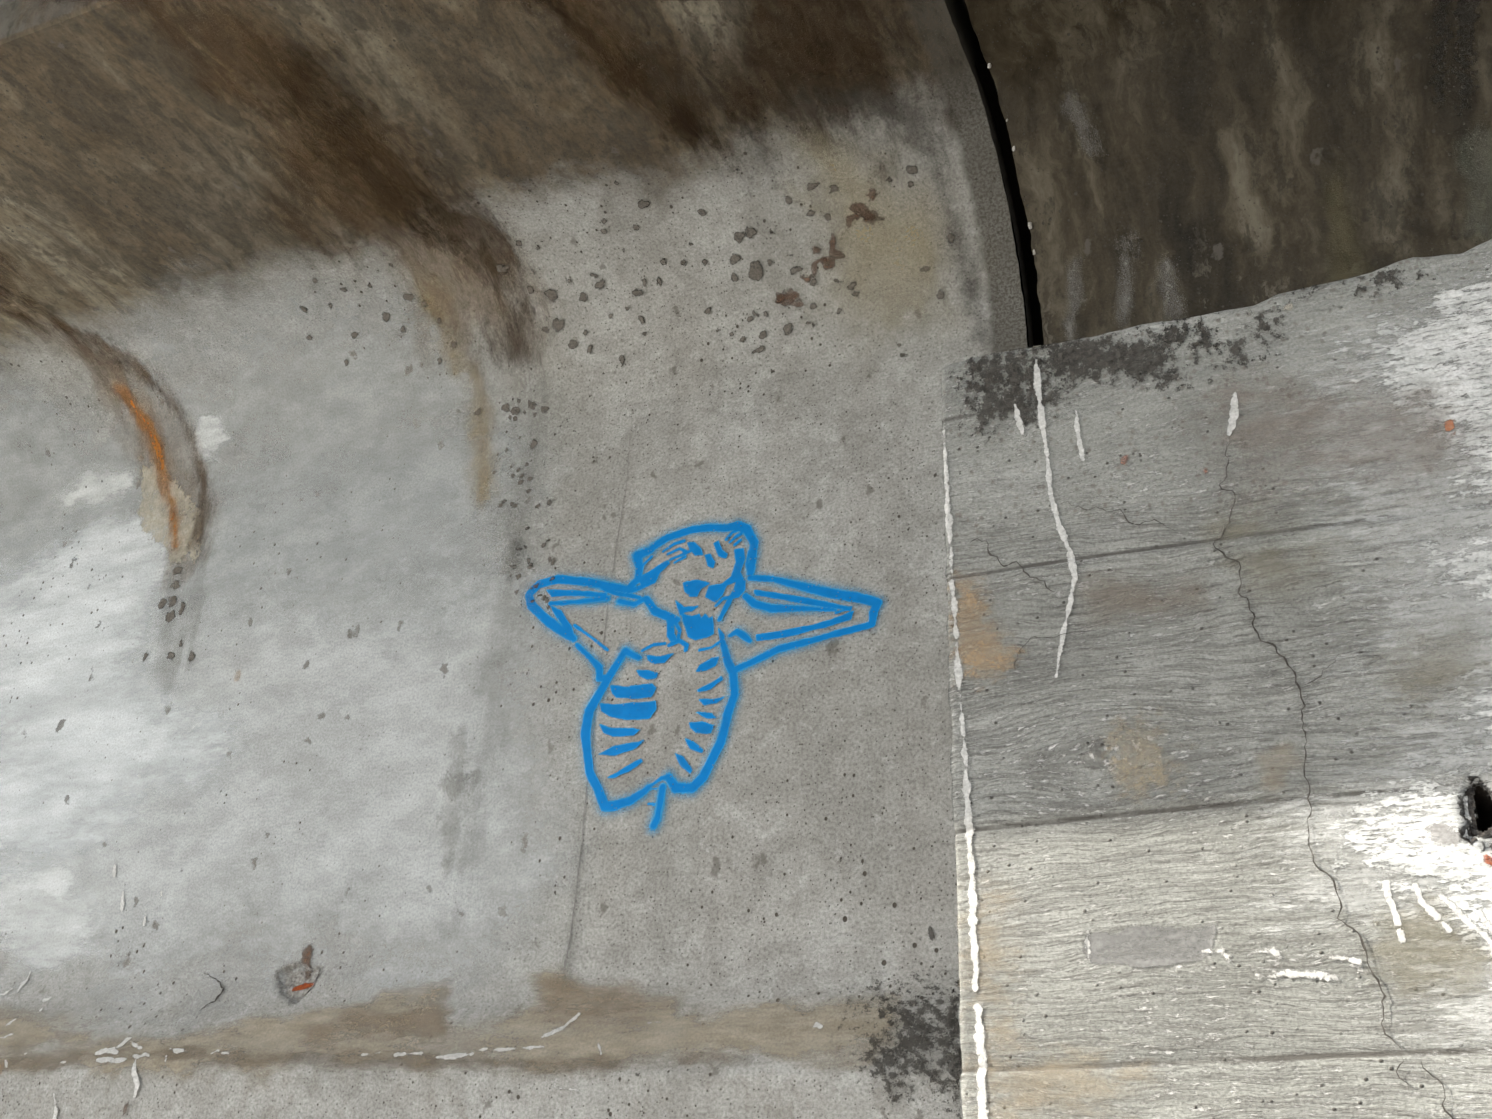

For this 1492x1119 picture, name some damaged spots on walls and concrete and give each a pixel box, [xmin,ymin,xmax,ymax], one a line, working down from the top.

damp [1118,242,1132,318]
rust [52,320,206,564]
crack [1061,501,1171,529]
peeling [1249,256,1492,1052]
crack [1213,432,1454,1119]
spalling [275,945,321,1005]
damp [836,972,962,1118]
peeling [1082,925,1232,968]